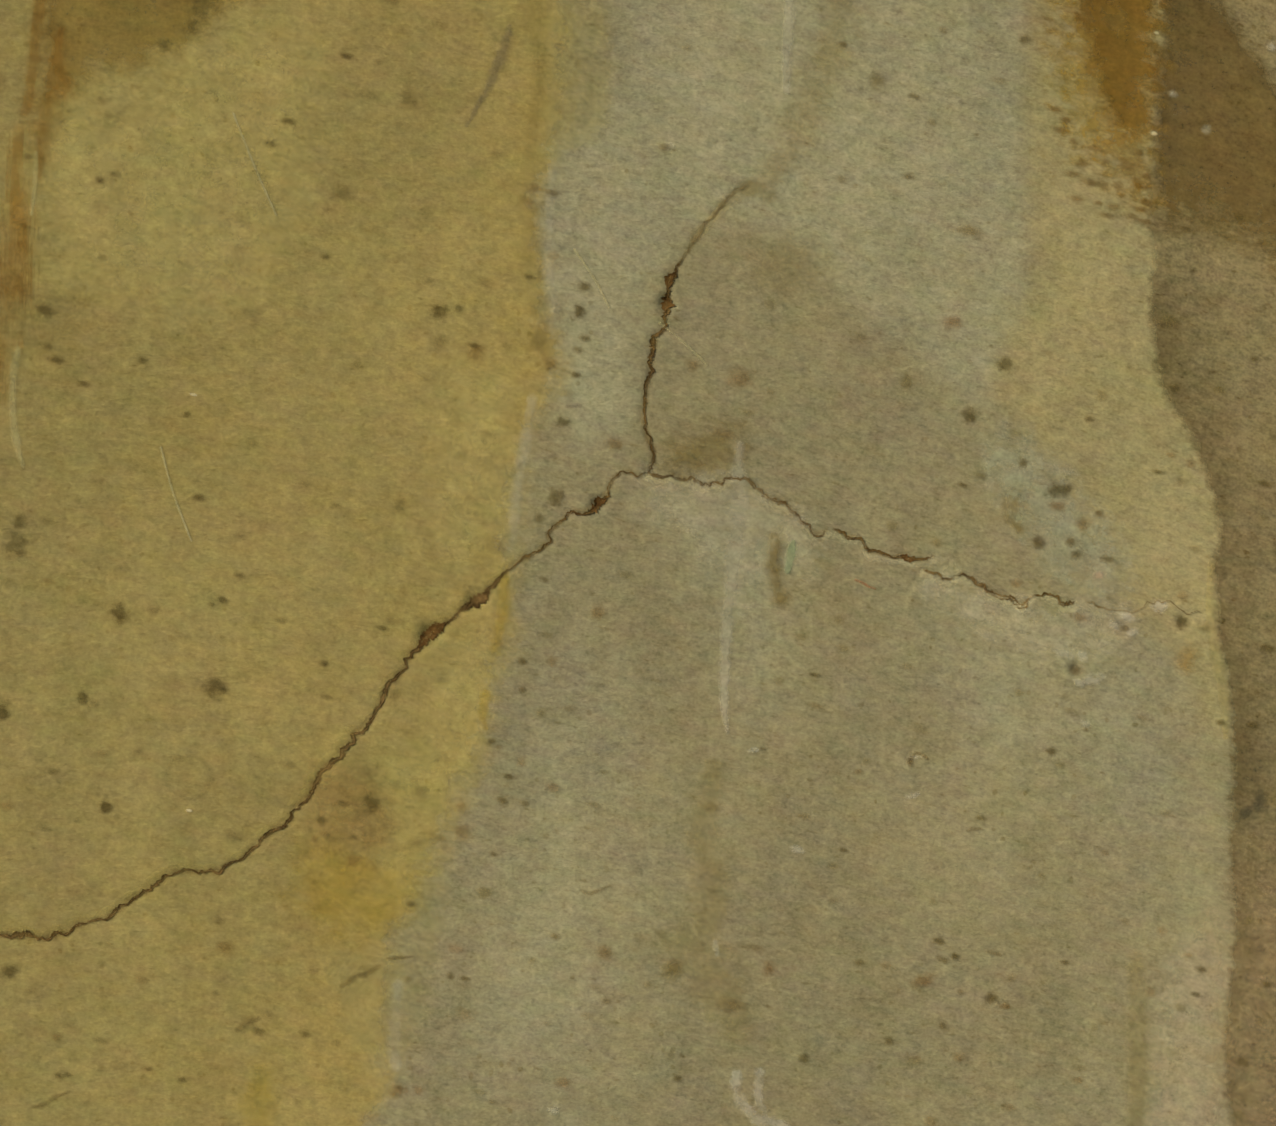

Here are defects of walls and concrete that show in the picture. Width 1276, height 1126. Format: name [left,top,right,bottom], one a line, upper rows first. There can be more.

corrosion [1055,0,1160,203]
crack [0,184,1200,941]
water stain [1147,0,1276,1126]